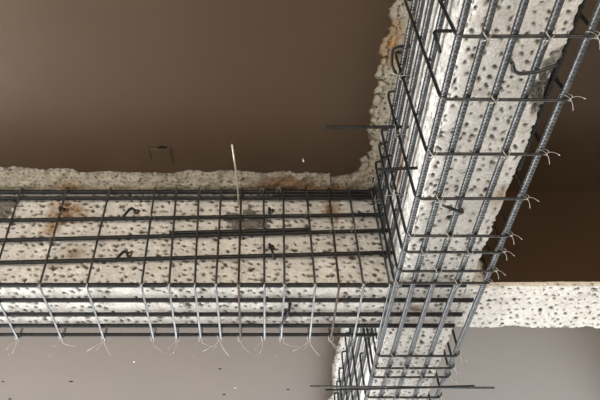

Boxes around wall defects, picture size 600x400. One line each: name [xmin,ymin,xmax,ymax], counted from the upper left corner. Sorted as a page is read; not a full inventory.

spalling [224,206,271,229]
spalling [328,328,349,400]